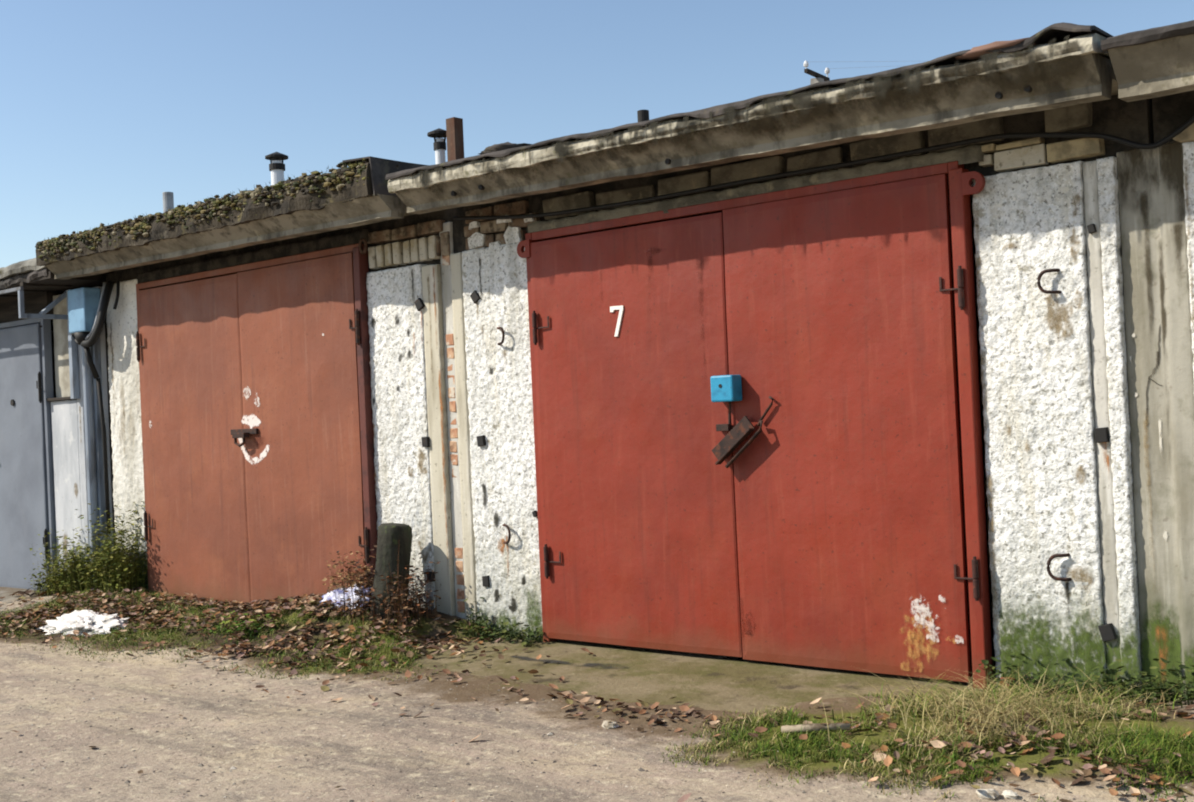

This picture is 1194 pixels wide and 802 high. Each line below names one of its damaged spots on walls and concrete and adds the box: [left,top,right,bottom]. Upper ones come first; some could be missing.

water stain [462,35,1085,178]
water stain [396,166,448,193]
water stain [1119,142,1184,252]
water stain [1146,239,1166,342]
crack [1146,326,1162,424]
water stain [1144,420,1162,449]
peeling [901,595,944,672]
water stain [1003,622,1052,680]